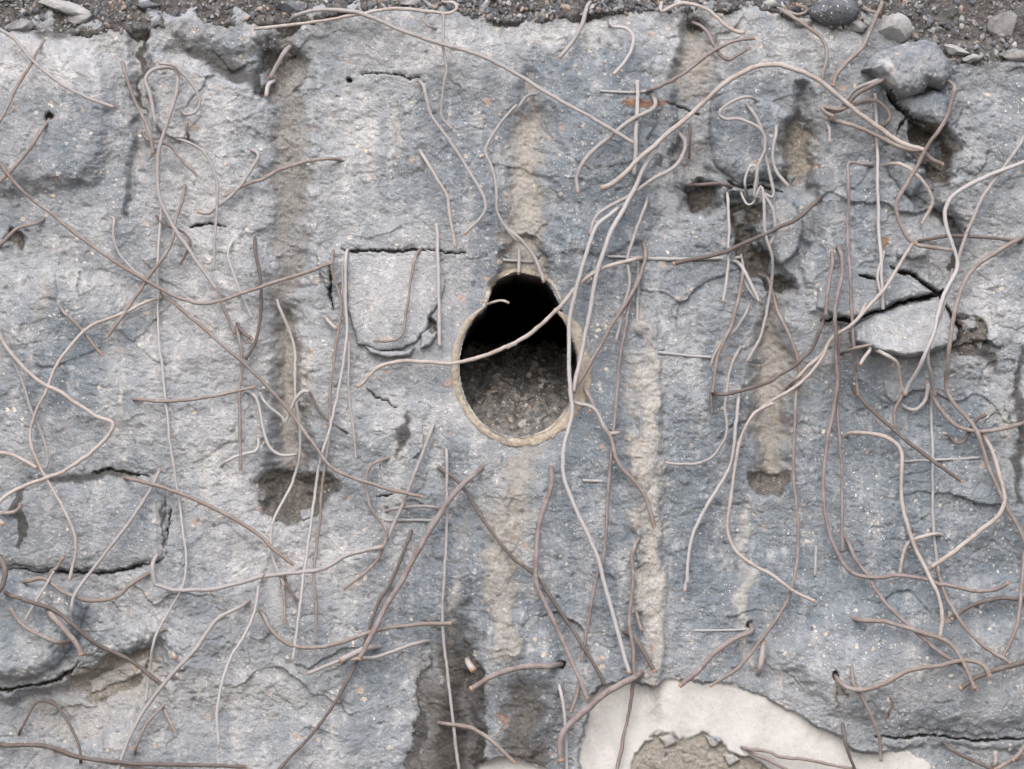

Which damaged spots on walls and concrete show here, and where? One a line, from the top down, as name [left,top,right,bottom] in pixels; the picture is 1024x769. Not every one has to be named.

damp [501,81,543,270]
crack [328,248,465,310]
crack [825,267,949,323]
crack [10,510,172,576]
crack [94,467,148,477]
damp [625,310,668,713]
damp [403,449,539,769]
damp [501,677,550,767]
peeling [578,677,931,769]